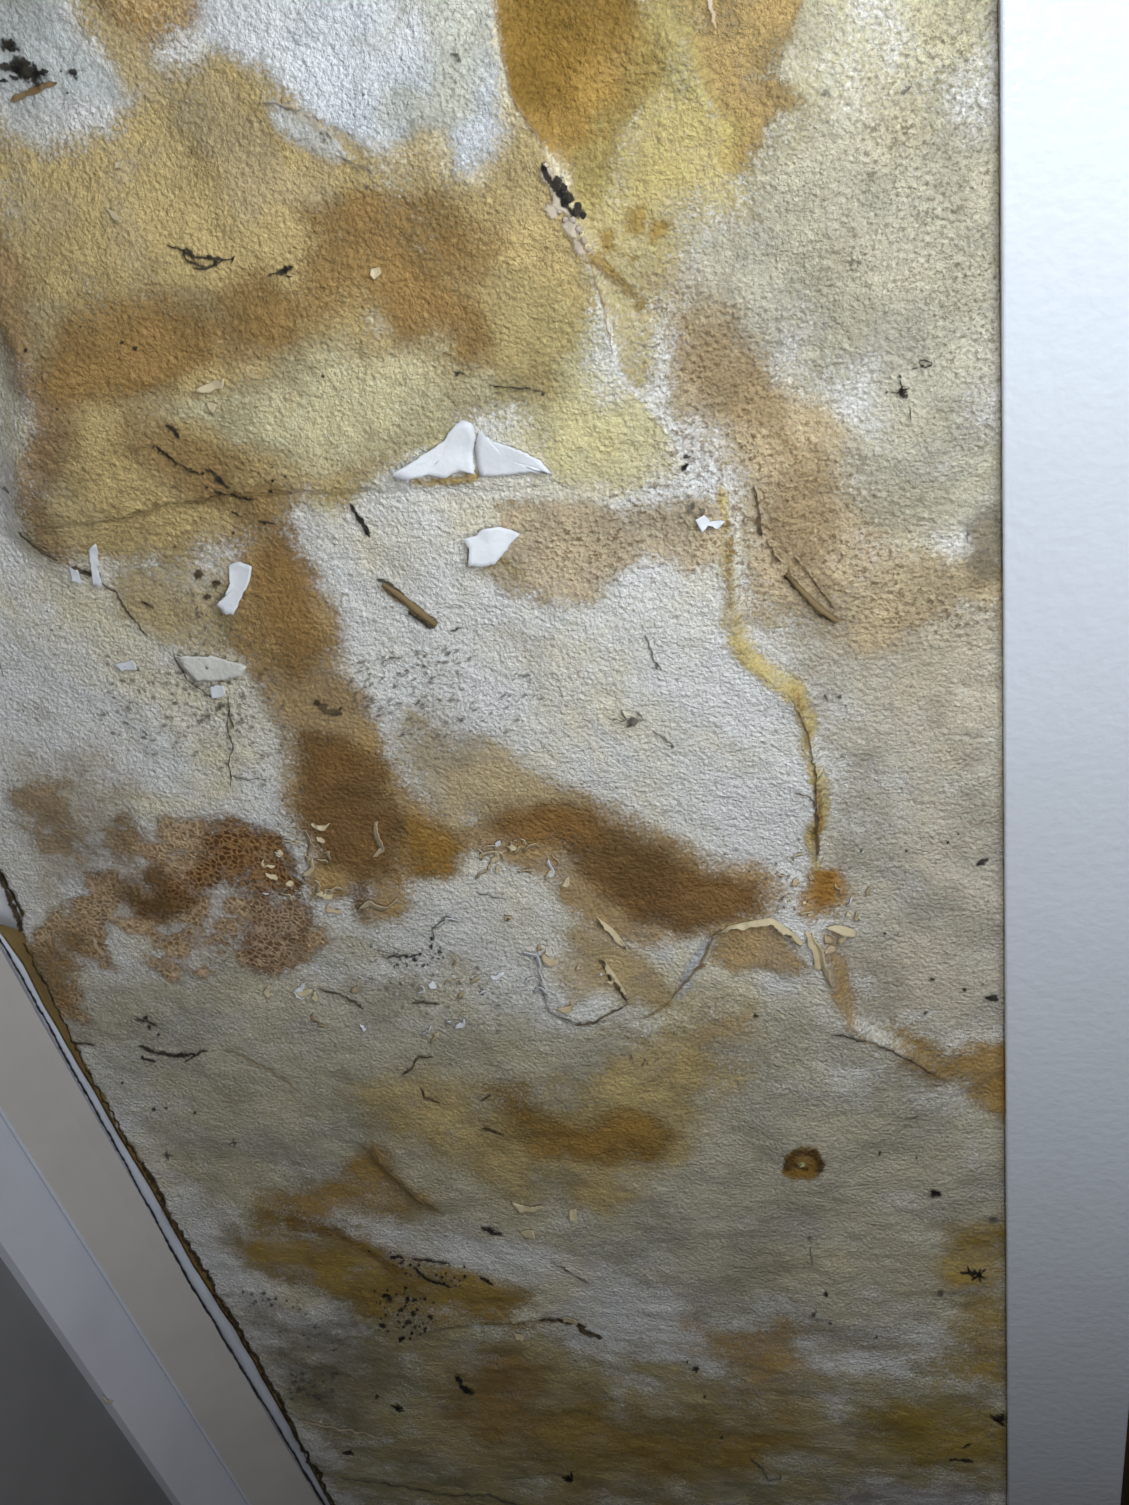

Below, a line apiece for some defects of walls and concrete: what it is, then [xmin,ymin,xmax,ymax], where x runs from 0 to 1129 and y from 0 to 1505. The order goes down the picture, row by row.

peeling [390,420,552,483]
peeling [59,544,114,600]
peeling [73,438,286,787]
peeling [464,527,520,567]
leakage [0,0,1004,1034]
crack [753,485,836,610]
peeling [261,767,398,914]
crack [793,702,821,862]
crack [555,921,801,1026]
leakage [26,812,1007,1505]
corrosion [782,1147,824,1180]